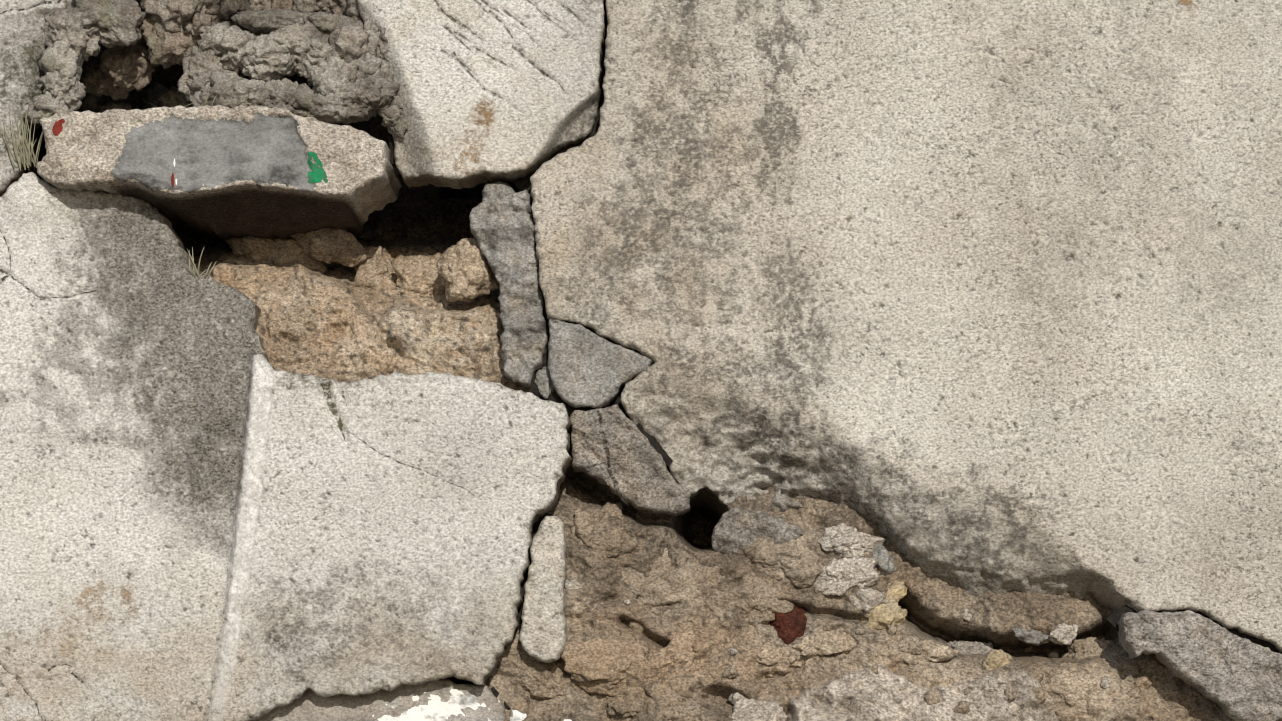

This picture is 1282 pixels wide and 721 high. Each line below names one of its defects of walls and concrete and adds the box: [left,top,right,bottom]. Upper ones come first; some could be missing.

spalling [24,0,408,149]
damp [586,0,747,326]
damp [749,4,806,204]
crack [0,230,96,300]
spalling [172,174,536,440]
crack [513,0,673,505]
damp [763,241,829,384]
damp [696,406,814,470]
spalling [372,413,1235,721]
damp [942,466,1046,595]
crack [1107,605,1282,654]